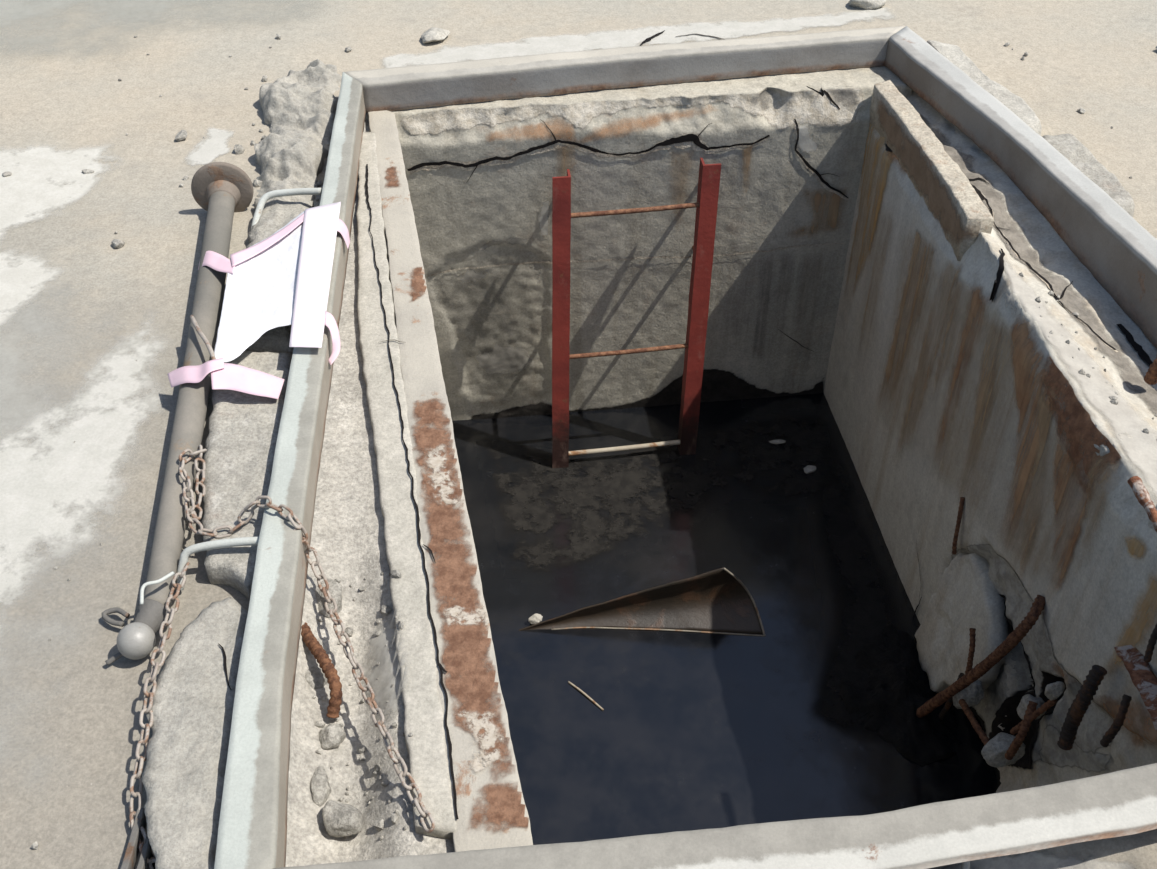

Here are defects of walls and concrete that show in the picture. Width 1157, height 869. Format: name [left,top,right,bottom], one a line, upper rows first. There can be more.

crack [407,119,849,200]
spalling [401,86,864,135]
crack [806,86,840,110]
rust [850,104,979,279]
crack [968,177,1153,366]
crack [365,164,458,819]
rust [939,288,1121,584]
rust [413,399,529,831]
spalling [914,497,1132,772]
spalling [1144,624,1157,662]
spalling [944,851,1135,869]